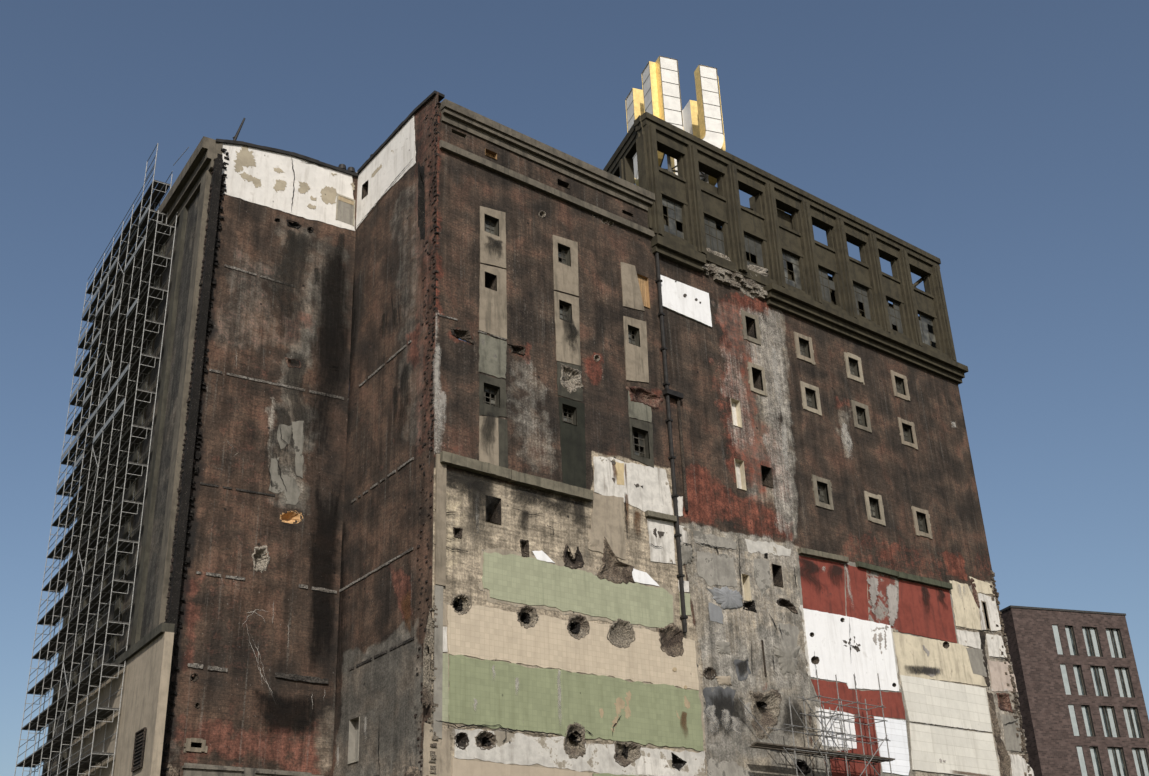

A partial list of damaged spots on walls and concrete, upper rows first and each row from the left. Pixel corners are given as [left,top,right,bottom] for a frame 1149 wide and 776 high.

crack [291,155,329,212]
spalling [702,248,769,300]
damp [268,230,355,458]
spalling [560,363,584,394]
spalling [162,146,337,776]
spalling [596,536,635,584]
spalling [607,618,635,648]
spalling [656,622,684,672]
peeling [843,576,899,654]
damp [250,643,314,733]
spalling [563,722,586,759]